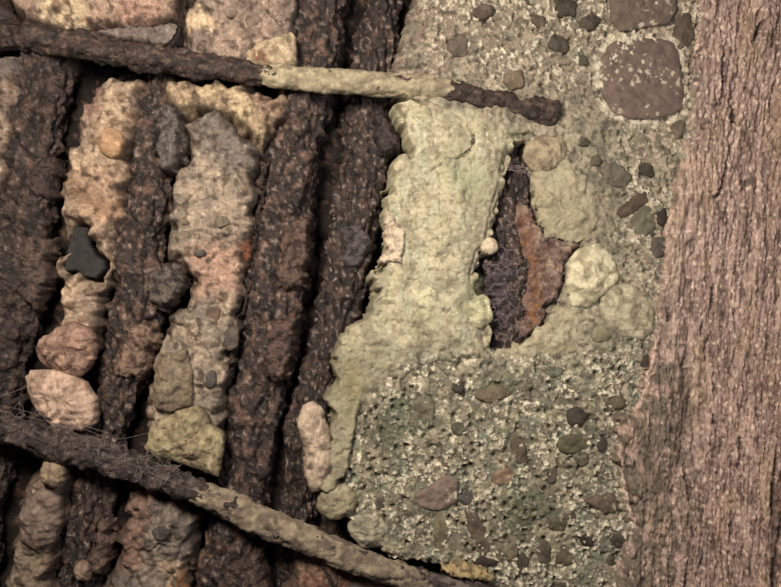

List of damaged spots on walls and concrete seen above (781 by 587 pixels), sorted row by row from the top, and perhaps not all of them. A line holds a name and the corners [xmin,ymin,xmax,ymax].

spalling [0,0,351,68]
spalling [320,0,705,587]